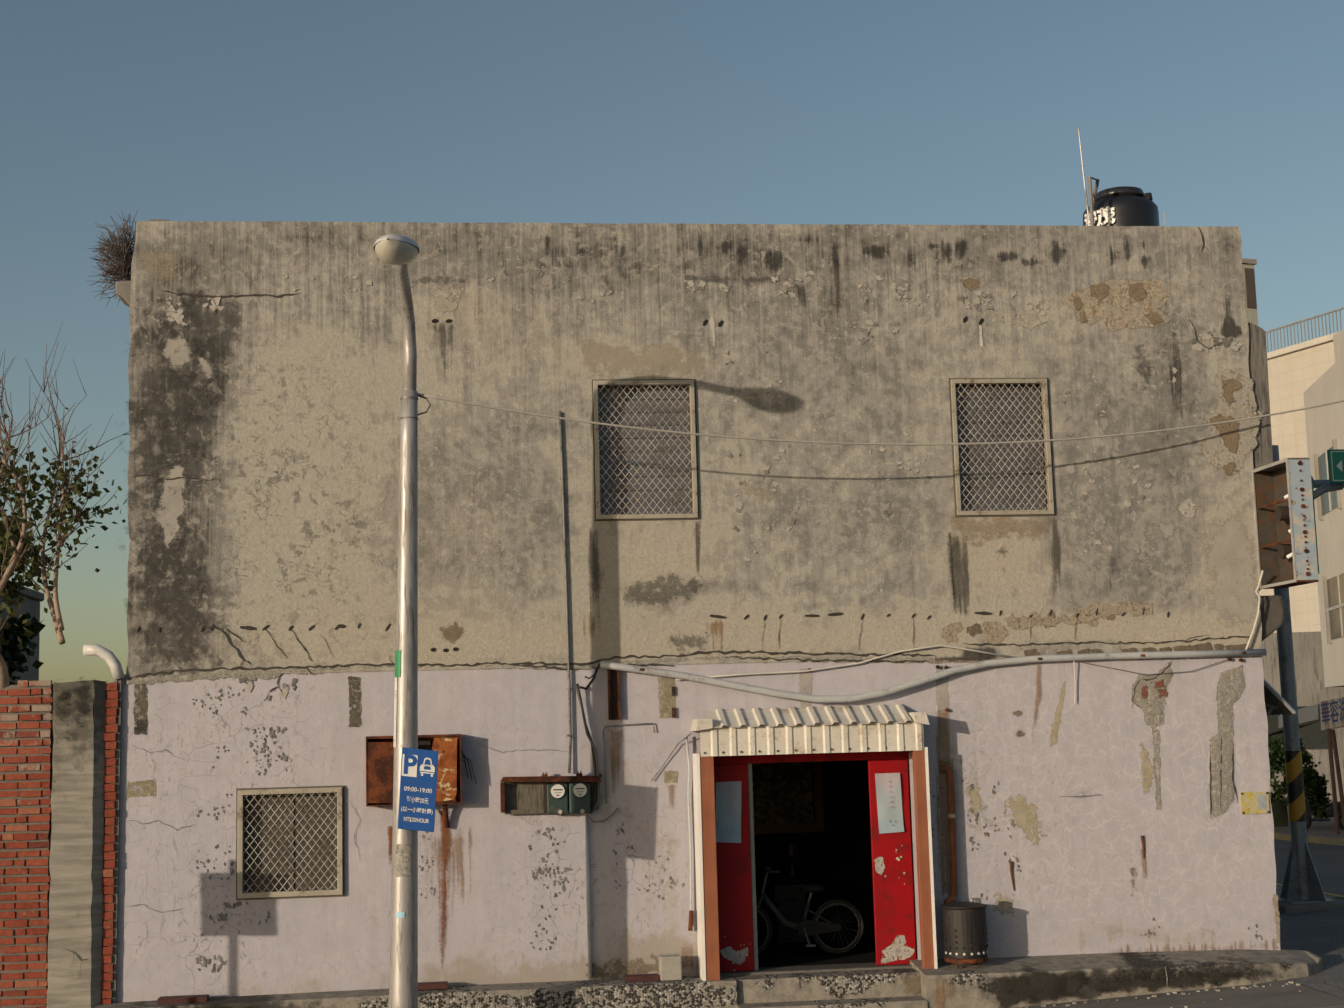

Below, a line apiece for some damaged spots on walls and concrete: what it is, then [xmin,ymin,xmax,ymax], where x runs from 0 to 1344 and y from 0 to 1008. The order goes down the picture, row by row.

flaking render [957,277,1171,332]
flaking render [1191,327,1242,352]
flaking render [1200,368,1264,478]
leakage [589,531,600,601]
leakage [949,533,969,613]
flaking render [932,601,1153,664]
flaking render [1121,642,1250,817]
peeling [961,780,1046,872]
rust [437,811,470,956]
peeling [720,943,751,971]
peeling [881,934,915,963]